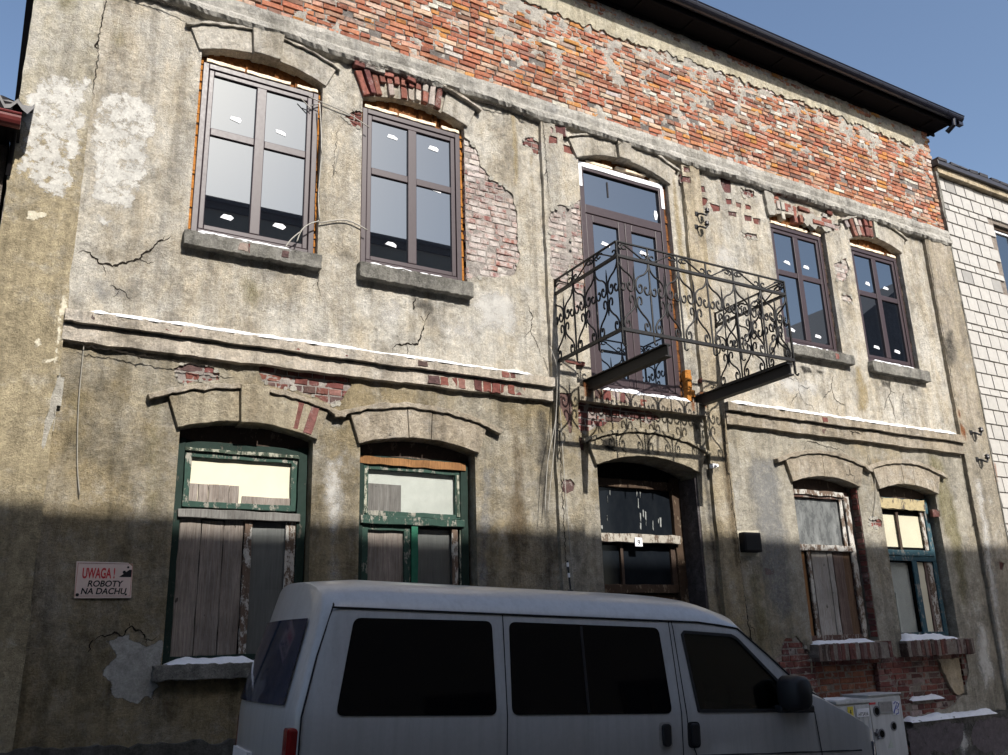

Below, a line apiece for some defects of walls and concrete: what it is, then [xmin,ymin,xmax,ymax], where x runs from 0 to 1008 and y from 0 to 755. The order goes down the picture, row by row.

peeling [16,74,156,208]
crack [92,0,107,106]
flaking render [340,108,362,129]
flaking render [352,60,443,111]
flaking render [462,138,520,280]
crack [80,236,171,299]
flaking render [544,201,585,315]
crack [394,299,430,353]
flaking render [174,362,220,385]
flaking render [259,366,351,435]
crack [88,623,159,652]
flaking render [775,636,1008,755]